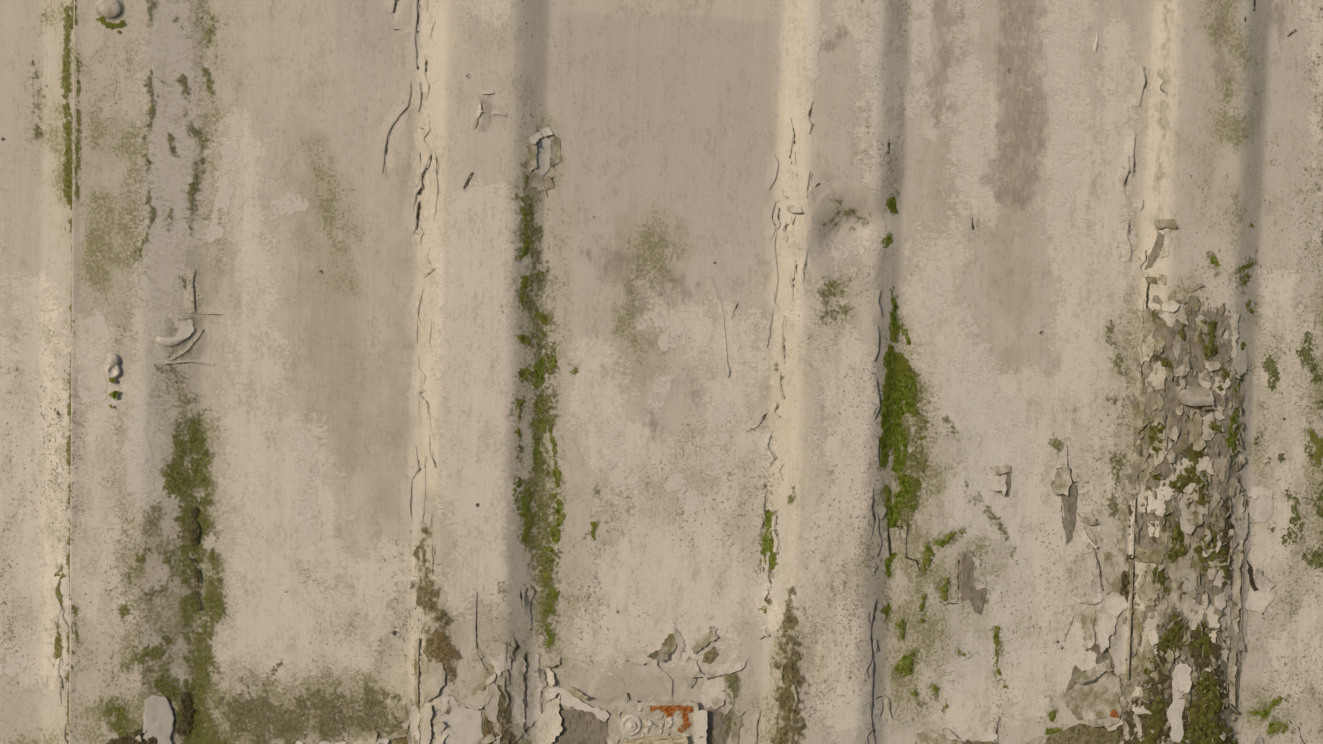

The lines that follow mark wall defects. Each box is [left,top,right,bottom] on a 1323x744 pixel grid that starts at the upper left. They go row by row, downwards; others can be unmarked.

peeling [156,268,224,366]
crack [373,0,439,719]
peeling [987,464,1011,497]
peeling [1025,218,1276,744]
damp [188,499,202,611]
peeling [943,550,990,615]
peeling [130,695,174,744]
rust [650,704,694,733]
peeling [619,620,748,744]
peeling [913,727,1000,744]